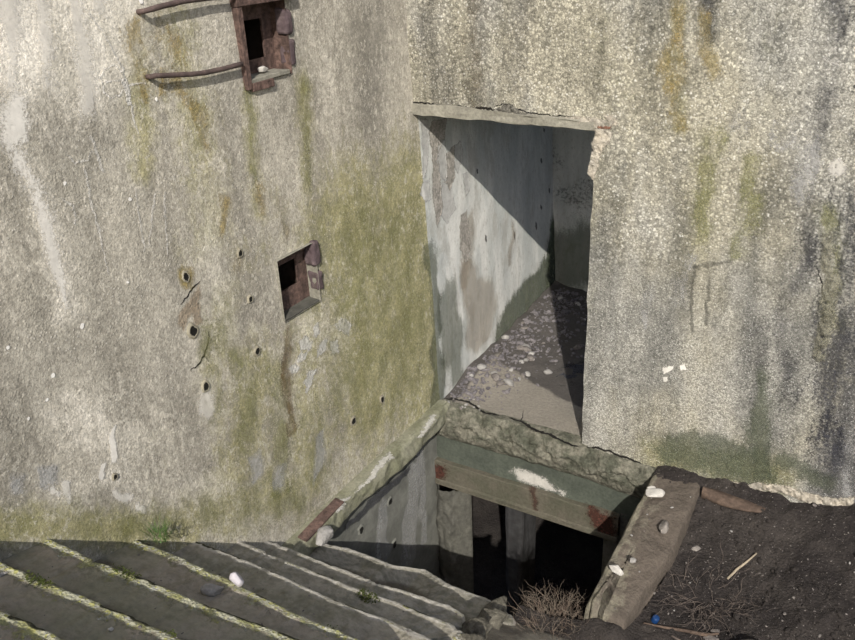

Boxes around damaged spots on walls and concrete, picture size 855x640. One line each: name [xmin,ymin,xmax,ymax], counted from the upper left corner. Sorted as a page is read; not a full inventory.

peeling [420,118,478,263]
leakage [495,215,555,342]
leakage [783,136,855,498]
crack [192,331,210,369]
crack [444,398,641,464]
leakage [50,481,71,504]
leakage [112,490,146,515]
corrosion [298,498,344,542]
leakage [345,467,410,530]
corrosion [435,465,448,480]
corrosion [585,506,618,541]